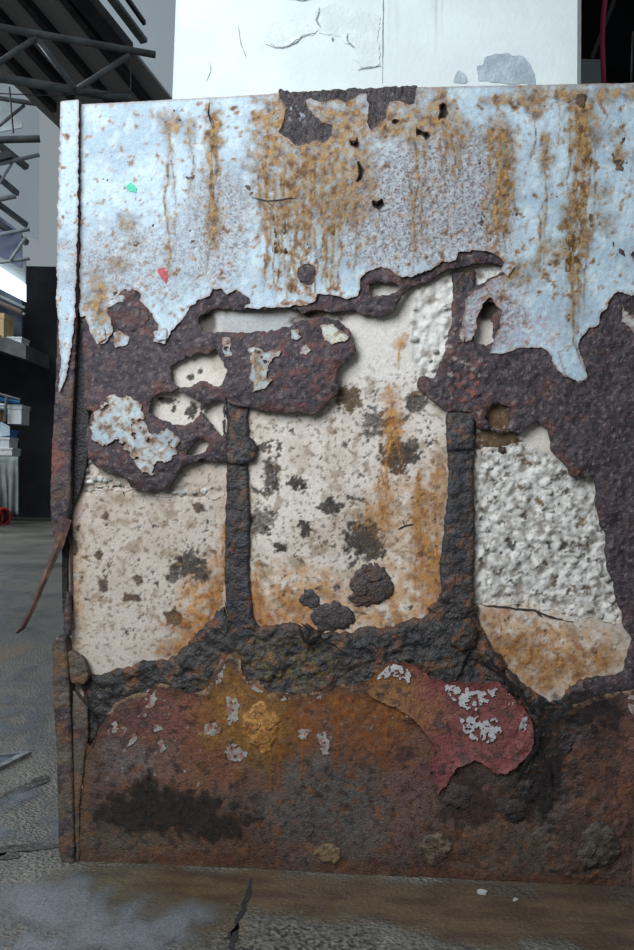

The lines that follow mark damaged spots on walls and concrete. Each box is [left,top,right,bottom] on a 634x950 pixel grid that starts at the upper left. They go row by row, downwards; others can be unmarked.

peeling [56,53,634,392]
corrosion [247,89,468,296]
corrosion [485,85,634,344]
corrosion [158,397,197,419]
corrosion [157,402,307,656]
corrosion [283,372,522,633]
crack [481,604,573,622]
peeling [204,696,240,736]
peeling [223,744,248,762]
peeling [296,729,330,755]
peeling [365,643,541,795]
crack [223,879,252,950]